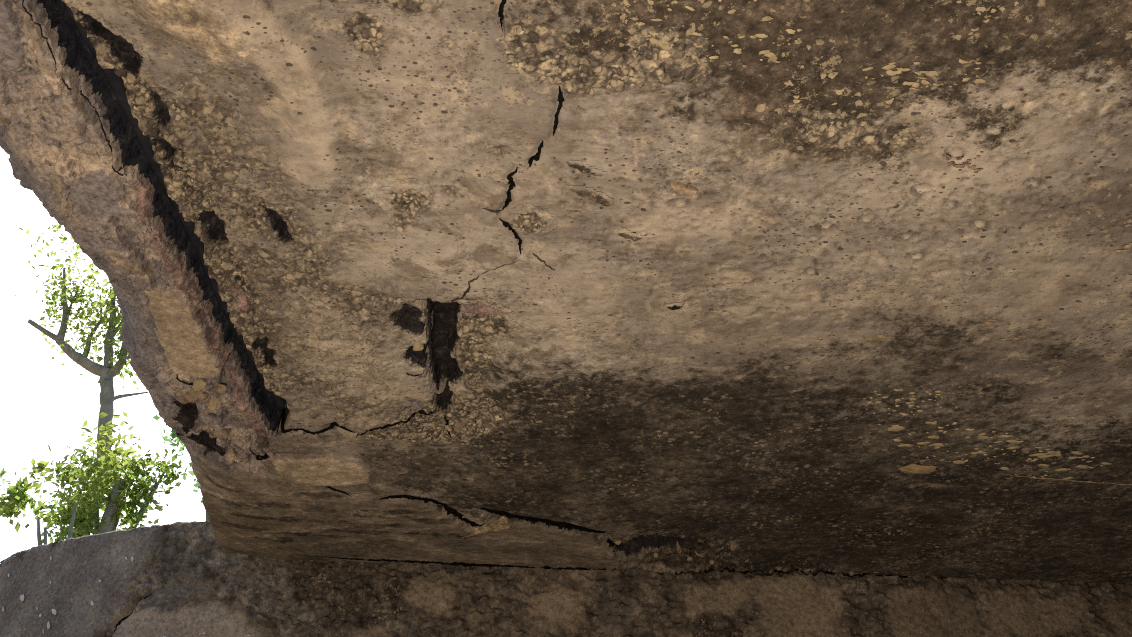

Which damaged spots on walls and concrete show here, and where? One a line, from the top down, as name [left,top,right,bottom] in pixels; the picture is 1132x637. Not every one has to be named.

crack [498,0,506,31]
leakage [385,0,1132,193]
crack [451,85,564,303]
crack [249,400,451,460]
spalling [358,298,523,447]
leakage [200,269,1132,637]
crack [298,495,947,590]